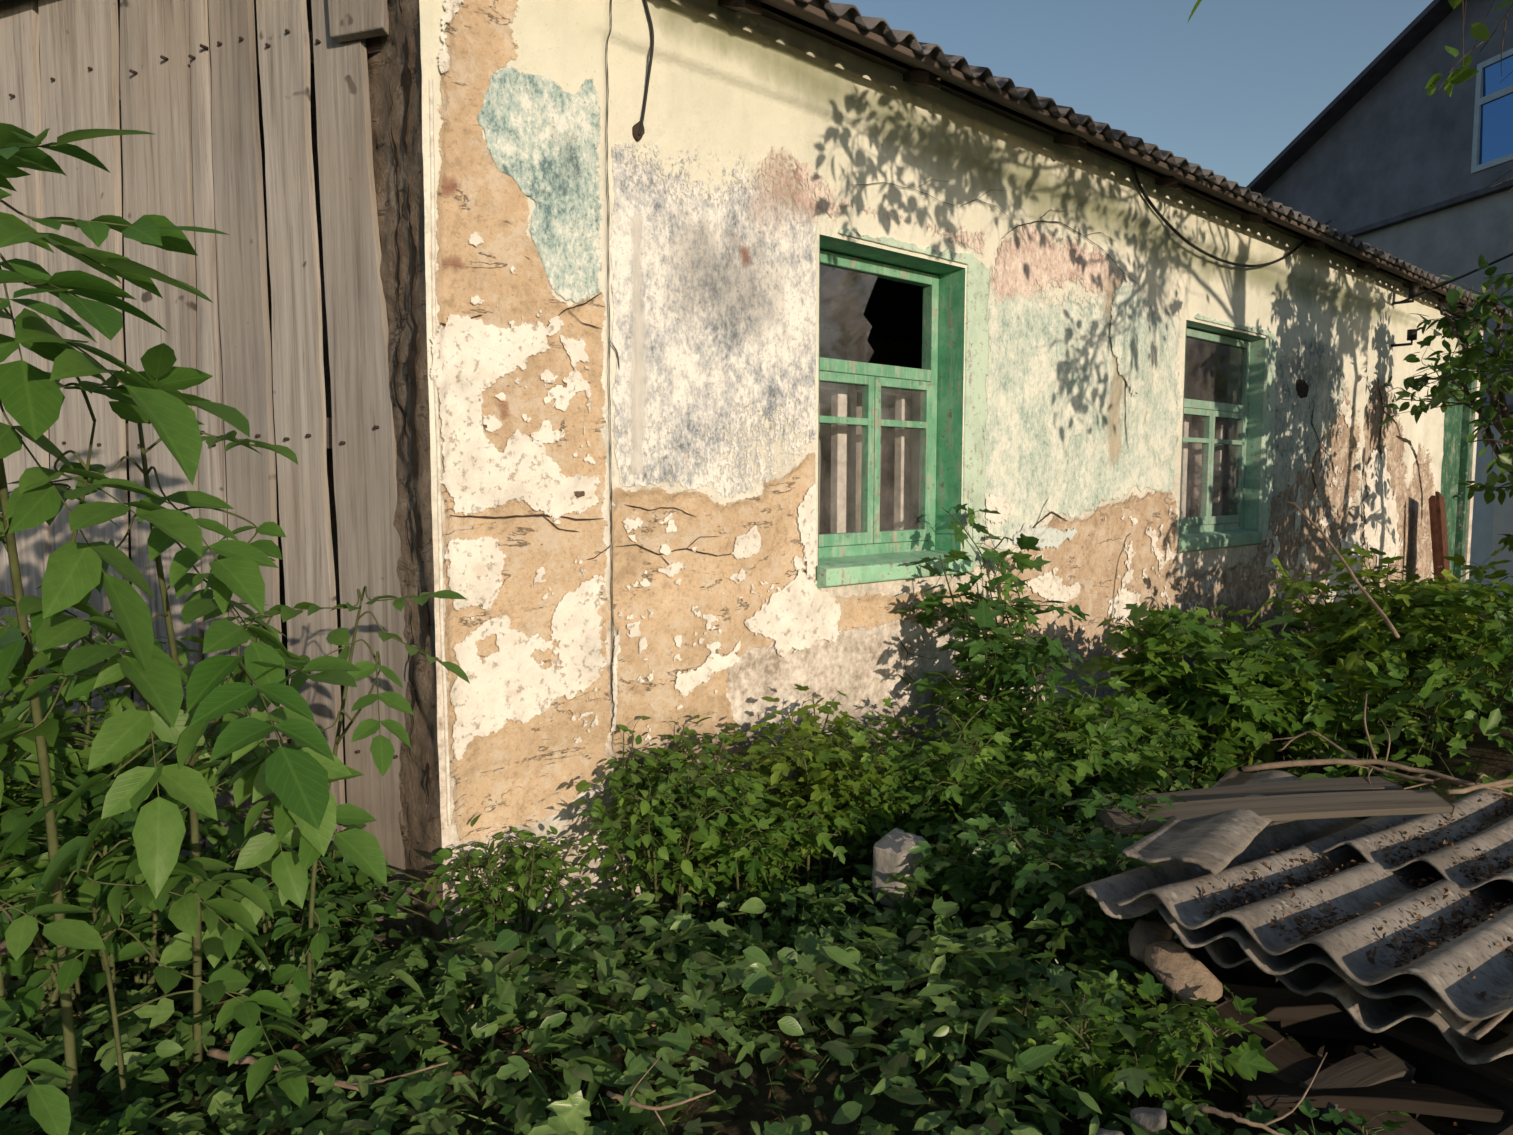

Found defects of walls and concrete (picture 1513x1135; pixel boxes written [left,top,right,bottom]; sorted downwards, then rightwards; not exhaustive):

flaking render [436,0,1438,843]
crack [1311,397,1337,498]